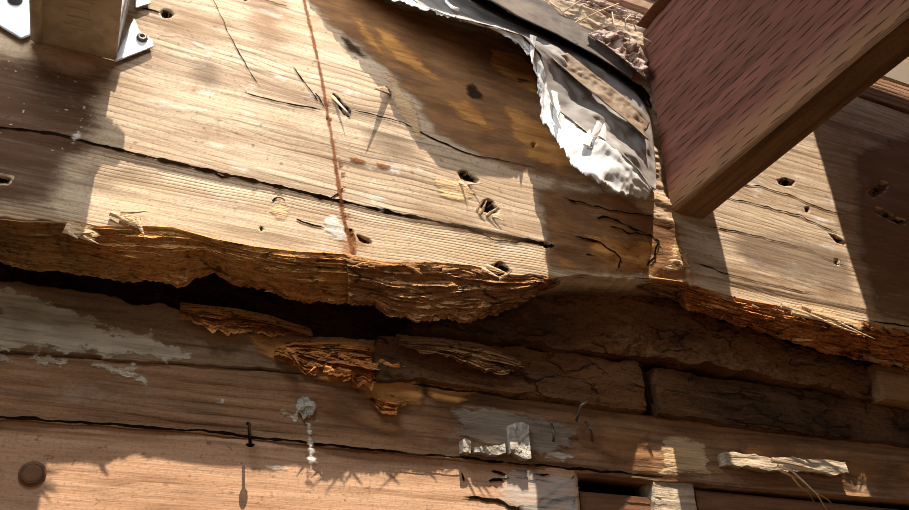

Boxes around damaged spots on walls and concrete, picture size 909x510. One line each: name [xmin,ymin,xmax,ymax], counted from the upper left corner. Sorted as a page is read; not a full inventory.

corrosion [303,0,365,253]
crack [0,126,595,256]
peeling [324,215,347,240]
peeling [352,261,388,270]
peeling [442,268,501,277]
damp [0,287,191,384]
peeling [280,345,400,374]
damp [317,359,472,402]
crack [0,416,663,510]